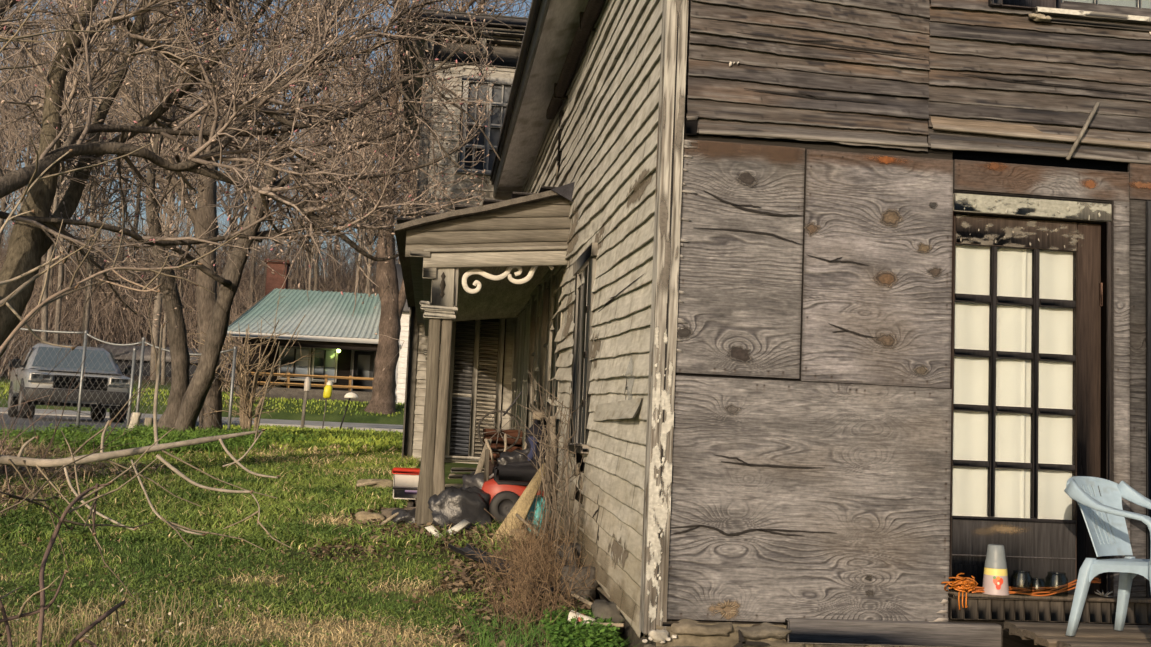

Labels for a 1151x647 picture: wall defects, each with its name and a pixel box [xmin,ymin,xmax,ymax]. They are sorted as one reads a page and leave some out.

peeling [626,68,698,303]
peeling [595,226,606,253]
peeling [956,193,1111,251]
peeling [590,328,601,370]
peeling [640,309,684,644]
peeling [608,522,629,568]